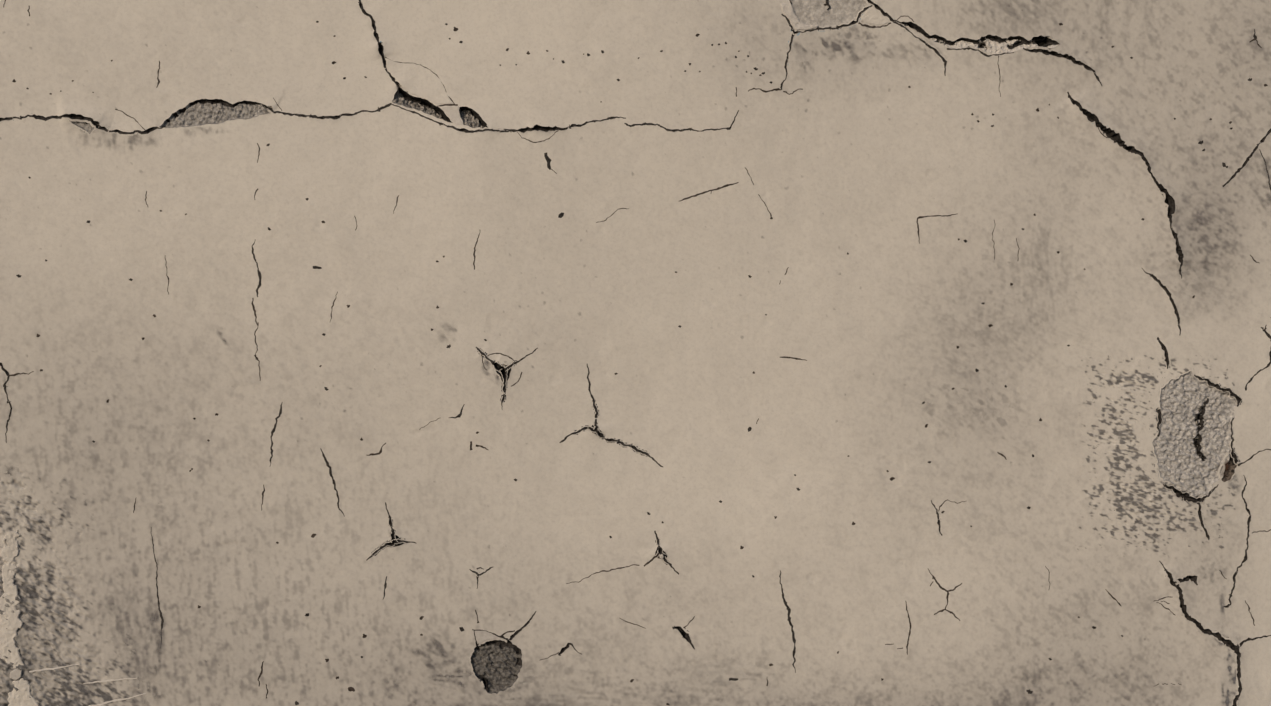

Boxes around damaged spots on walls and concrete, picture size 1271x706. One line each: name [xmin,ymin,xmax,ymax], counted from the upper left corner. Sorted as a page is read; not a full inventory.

spalling [781,0,1061,56]
crack [0,109,166,136]
spalling [159,97,272,129]
crack [251,239,262,381]
crack [267,0,1271,706]
crack [0,362,34,443]
crack [261,404,282,511]
spalling [1151,369,1237,498]
peeling [0,453,160,706]
peeling [475,631,498,644]
crack [258,661,268,698]